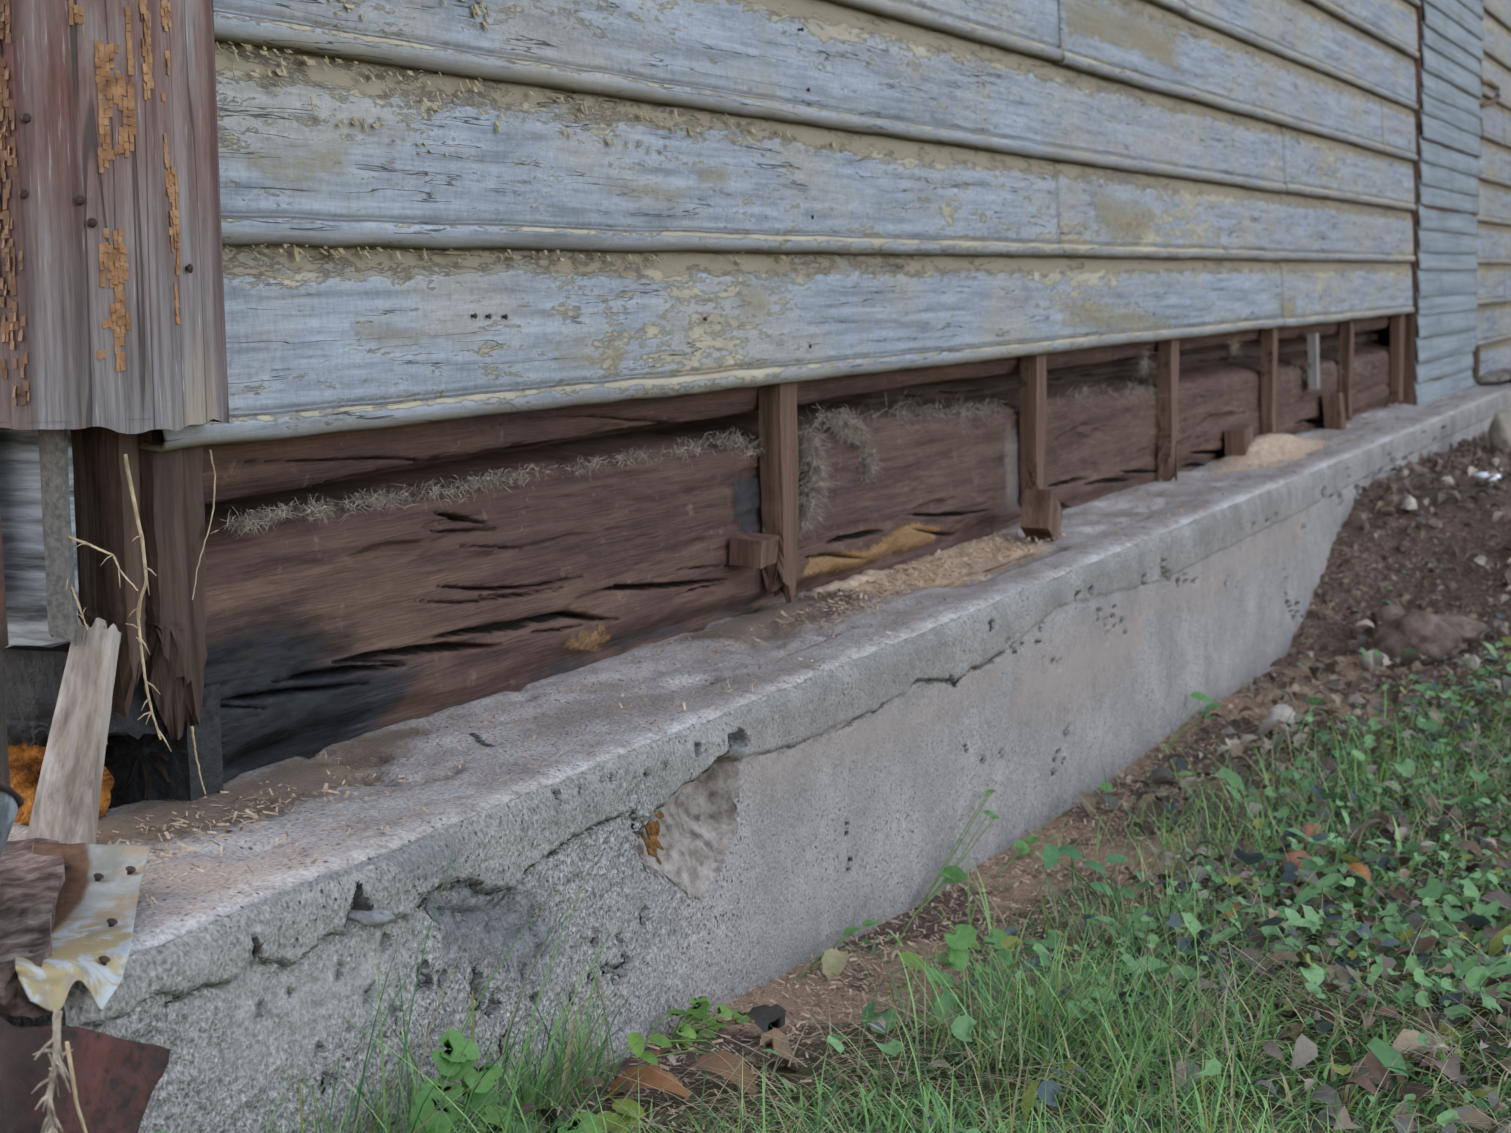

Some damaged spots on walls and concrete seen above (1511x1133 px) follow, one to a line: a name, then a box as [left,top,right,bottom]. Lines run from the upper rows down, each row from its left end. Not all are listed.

peeling [95,0,172,173]
peeling [216,41,531,157]
peeling [0,0,30,406]
peeling [97,227,131,372]
peeling [223,243,666,270]
crack [1048,450,1219,508]
crack [807,531,879,558]
crack [304,567,723,676]
crack [753,651,1006,756]
crack [451,812,641,897]
spalling [637,728,751,900]
crack [164,932,339,1007]